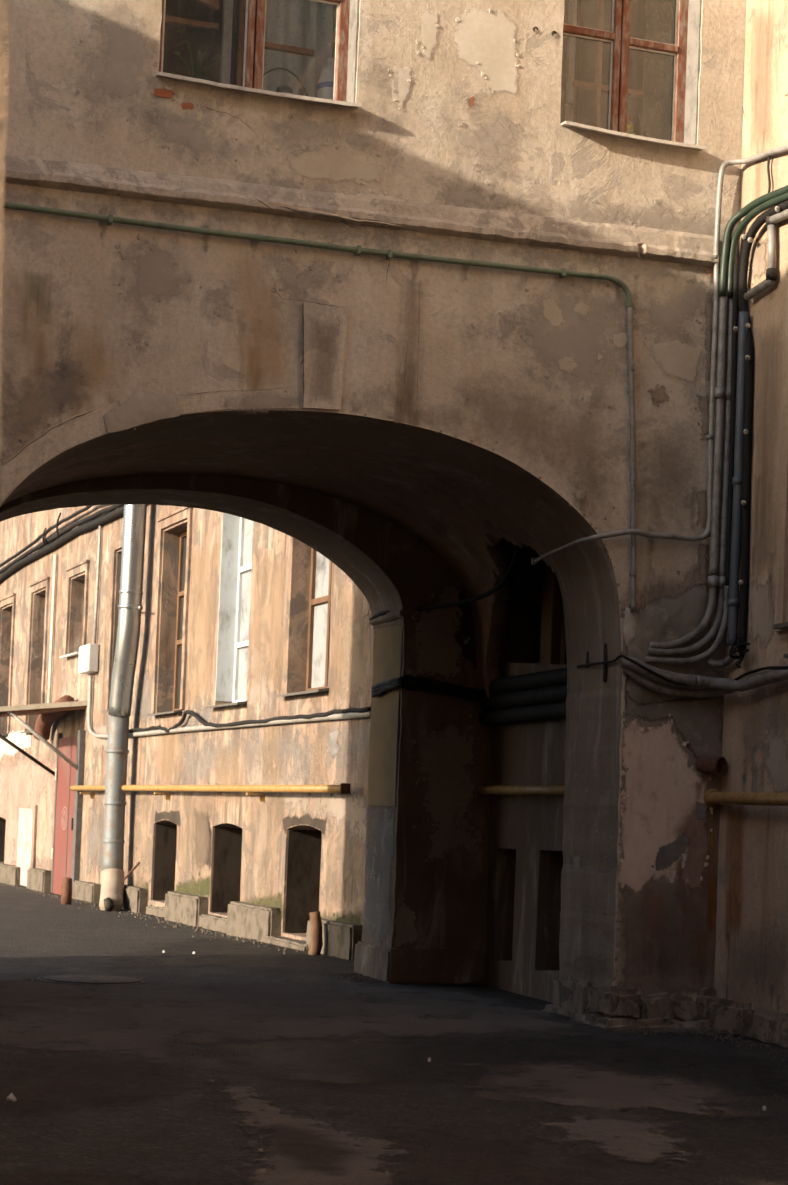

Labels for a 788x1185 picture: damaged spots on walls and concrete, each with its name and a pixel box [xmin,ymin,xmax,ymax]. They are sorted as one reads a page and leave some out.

peeling [389,66,412,110]
peeling [416,11,439,59]
peeling [453,3,558,94]
peeling [648,266,714,441]
flaking render [620,491,726,673]
flaking render [617,699,713,893]